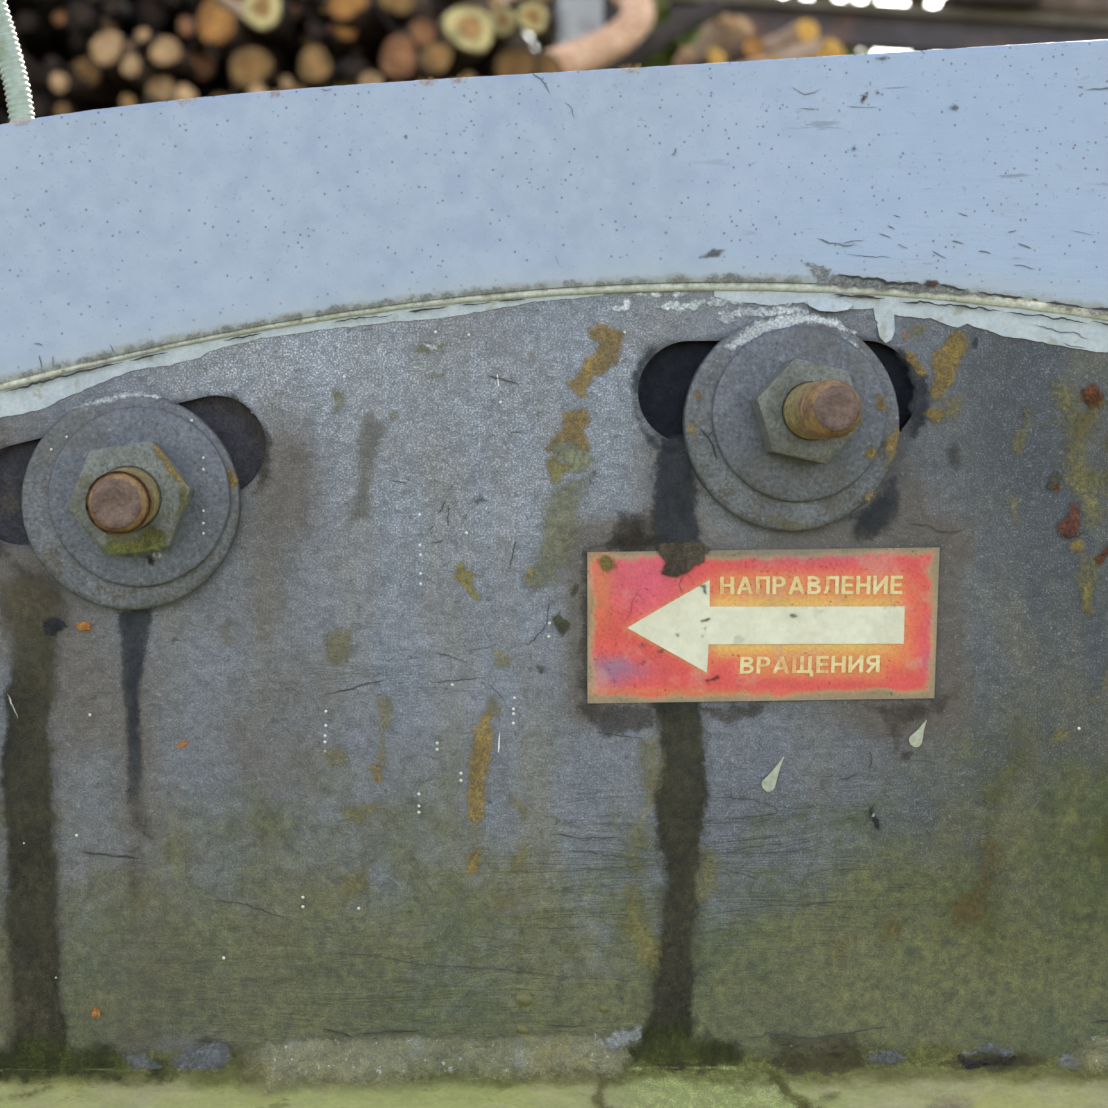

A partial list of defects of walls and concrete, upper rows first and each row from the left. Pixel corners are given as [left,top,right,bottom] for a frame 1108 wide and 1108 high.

peeling [0,294,603,417]
peeling [608,263,1108,352]
rust [904,331,969,422]
rust [527,324,623,589]
leakage [613,436,701,551]
rust [1053,383,1108,609]
leakage [119,609,151,797]
leakage [1,572,66,1052]
rust [468,711,492,821]
leakage [647,702,708,1039]
leakage [592,1068,836,1108]